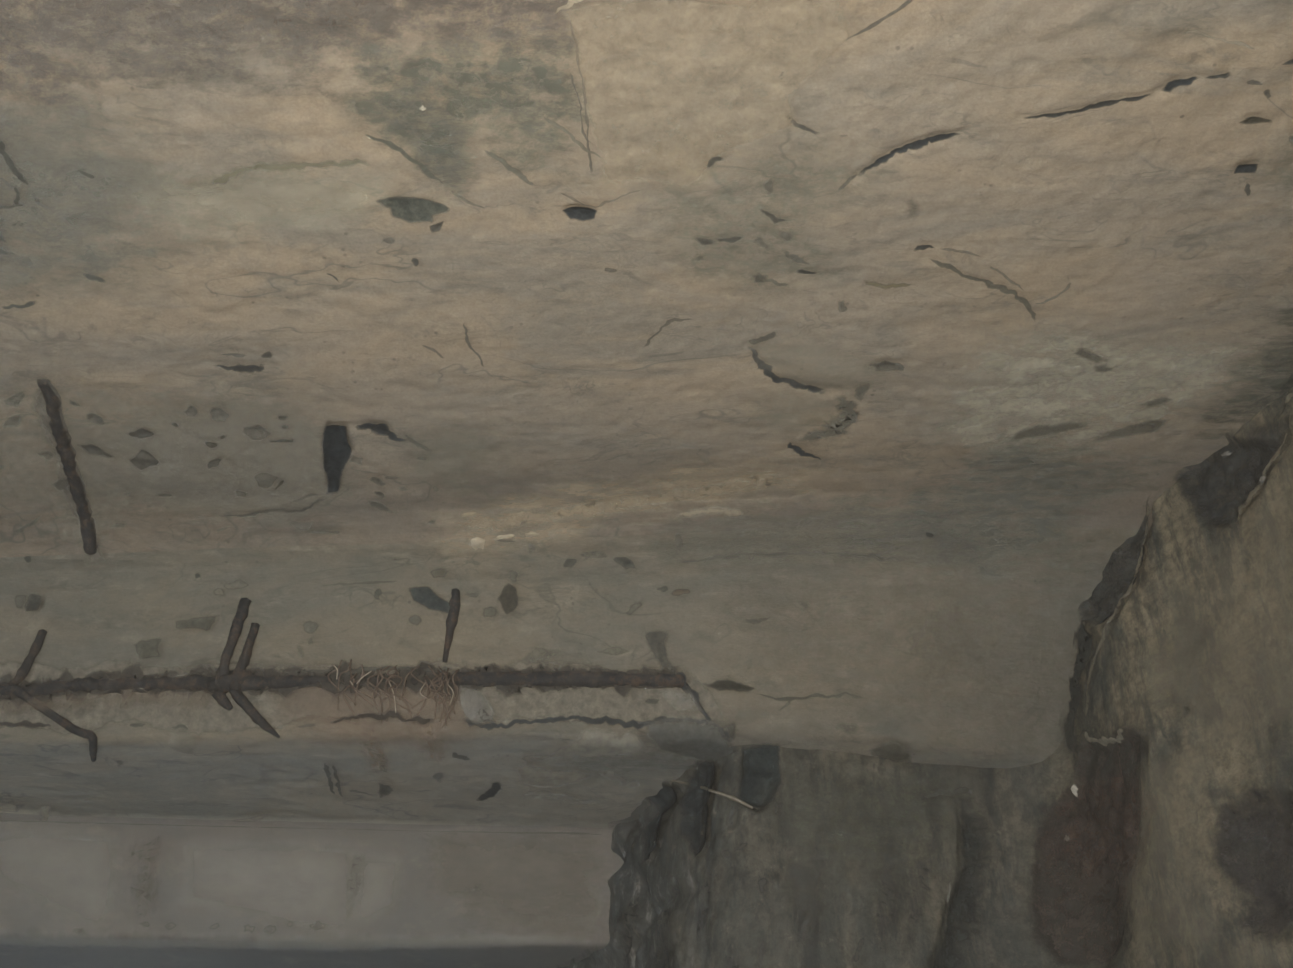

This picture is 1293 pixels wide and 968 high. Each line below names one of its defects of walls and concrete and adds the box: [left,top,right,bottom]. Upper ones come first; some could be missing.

rust [289,686,466,767]